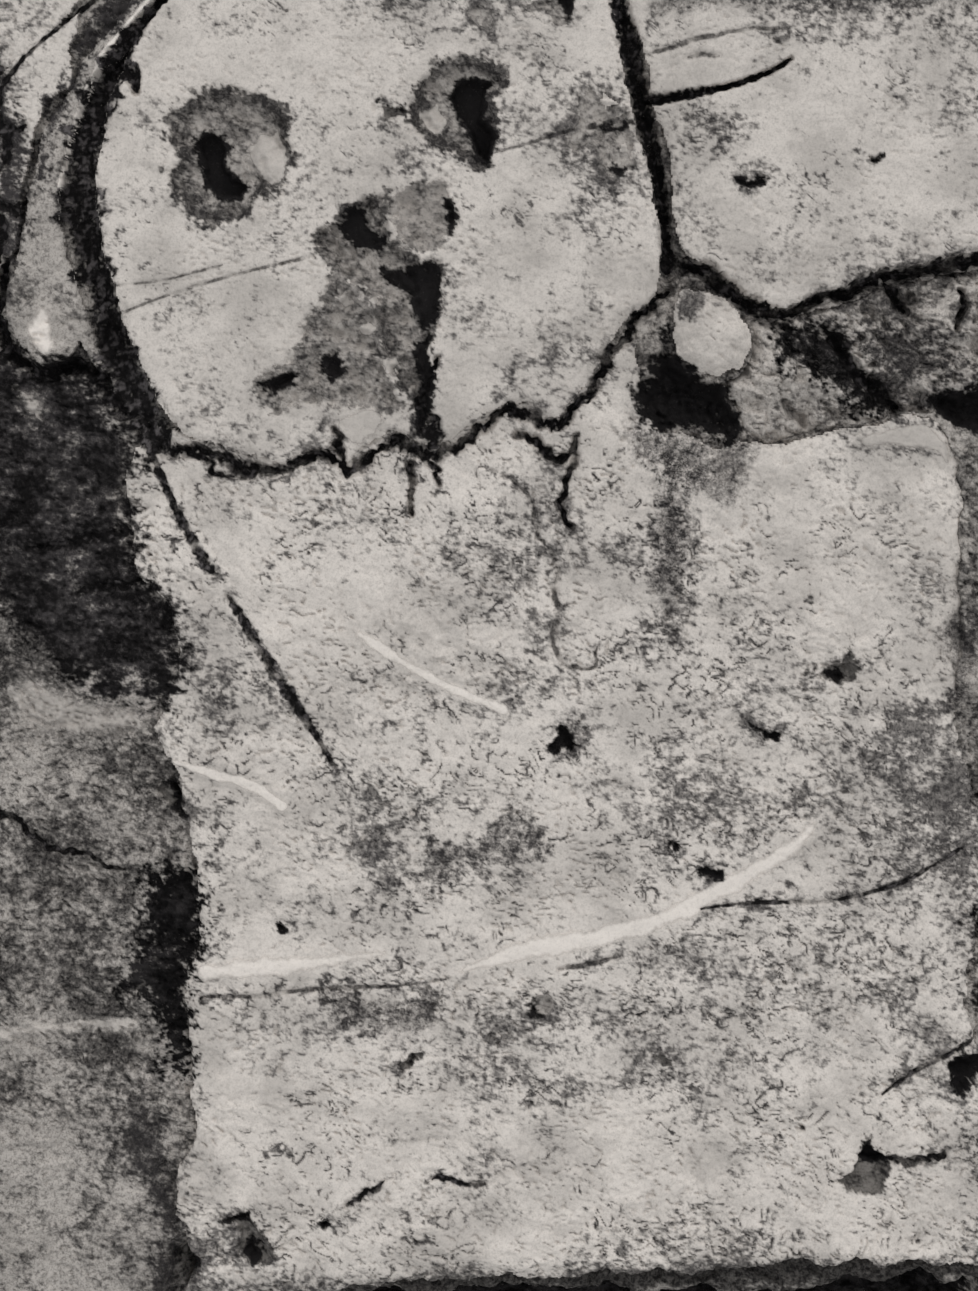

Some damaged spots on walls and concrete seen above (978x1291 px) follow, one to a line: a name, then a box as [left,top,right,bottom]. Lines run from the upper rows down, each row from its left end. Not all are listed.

crack [0,0,978,773]